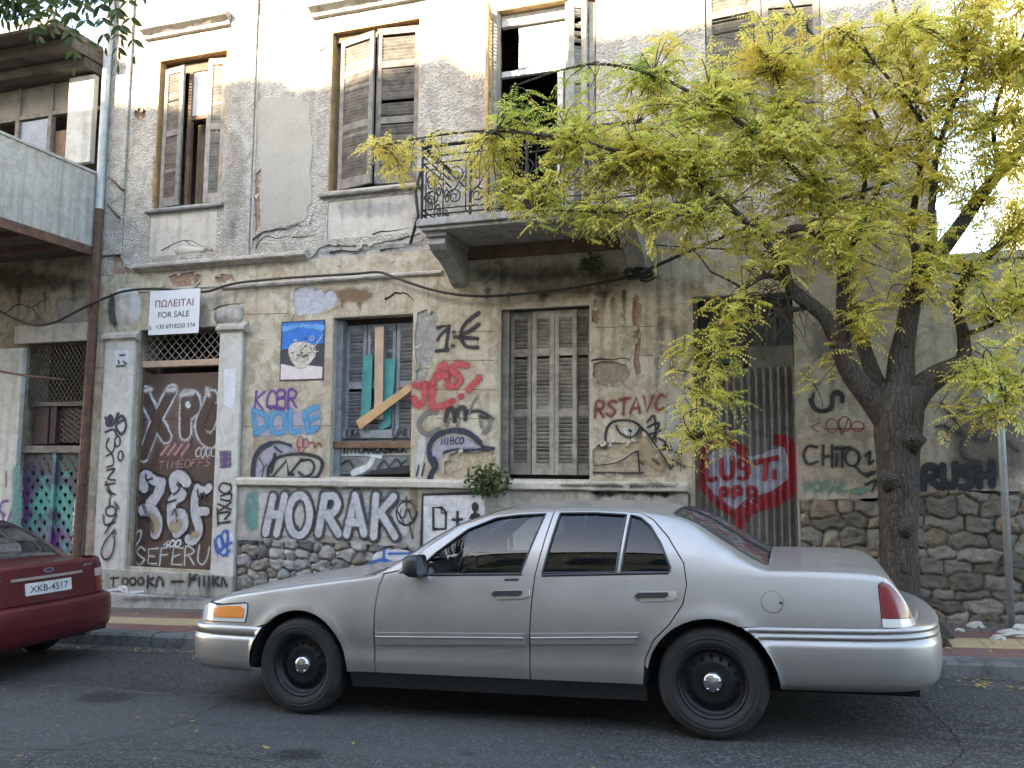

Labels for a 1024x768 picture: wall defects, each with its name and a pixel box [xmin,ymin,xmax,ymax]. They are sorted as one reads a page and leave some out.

flaking render [253,171,262,231]
crack [252,211,407,254]
flaking render [169,272,201,287]
peeling [413,309,442,393]
flaking render [592,295,643,388]